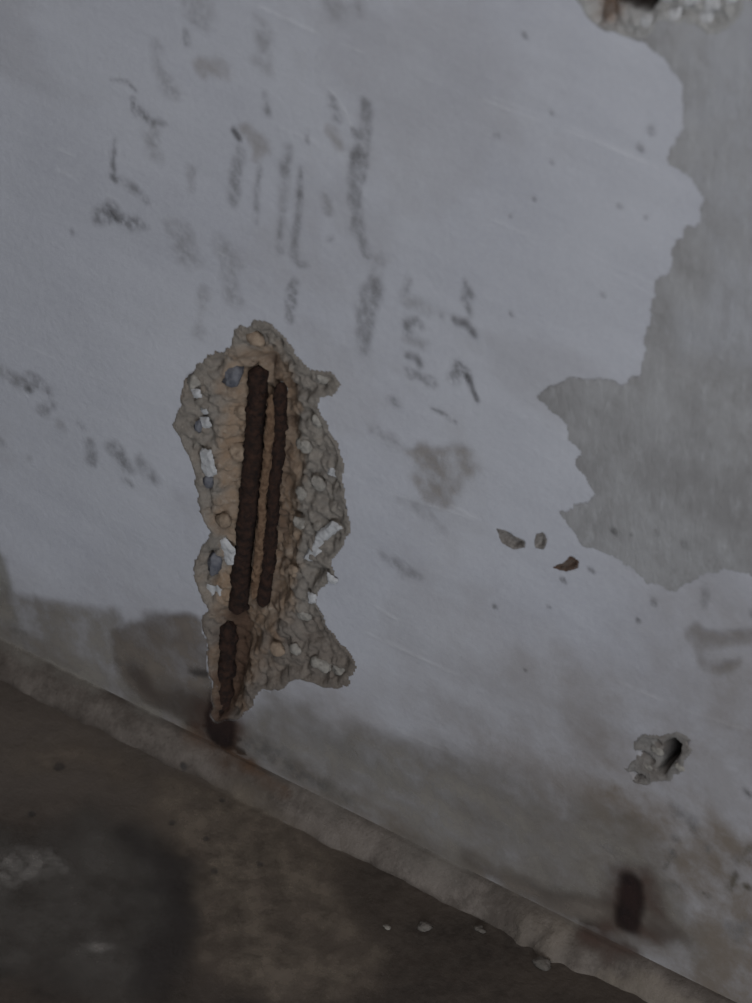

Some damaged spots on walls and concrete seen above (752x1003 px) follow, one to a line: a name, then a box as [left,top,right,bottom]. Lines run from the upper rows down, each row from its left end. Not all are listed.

peeling [537,0,752,592]
spalling [172,319,357,722]
spalling [624,731,693,785]